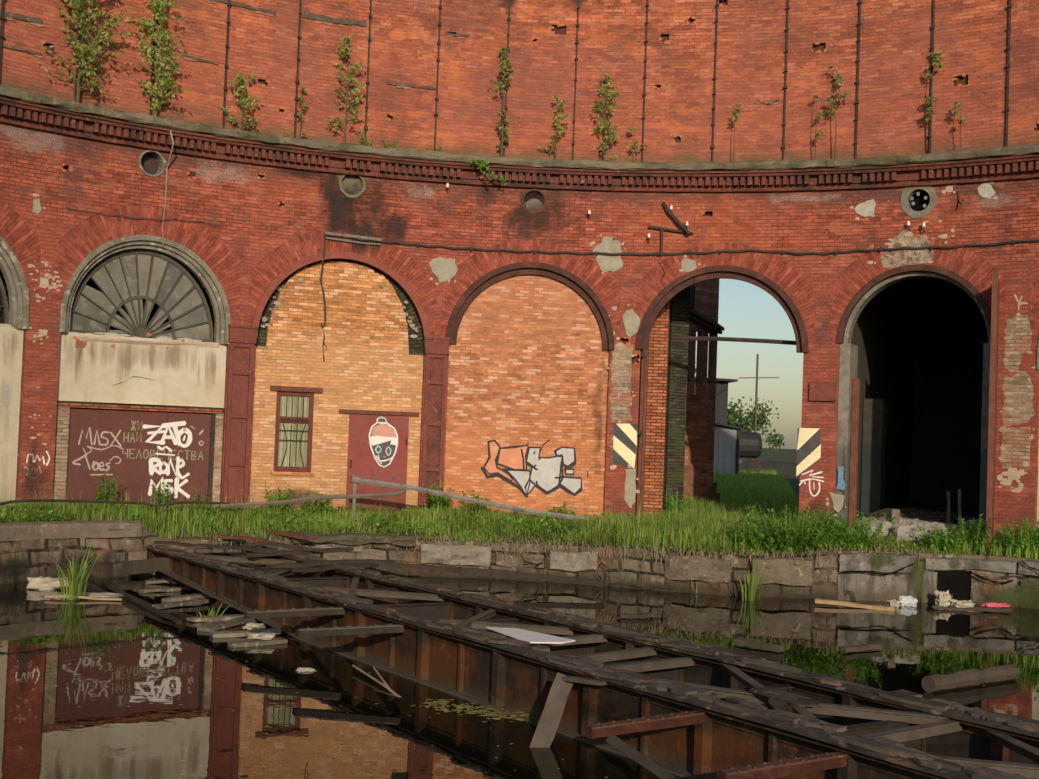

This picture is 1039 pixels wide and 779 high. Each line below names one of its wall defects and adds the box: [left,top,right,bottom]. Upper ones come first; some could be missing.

water stain [322,176,405,248]
peeling [27,261,63,304]
flaking render [429,257,458,285]
flaking render [589,234,626,274]
spalling [867,220,955,268]
spalling [607,304,640,423]
spalling [997,313,1037,501]
flaking render [610,464,640,508]